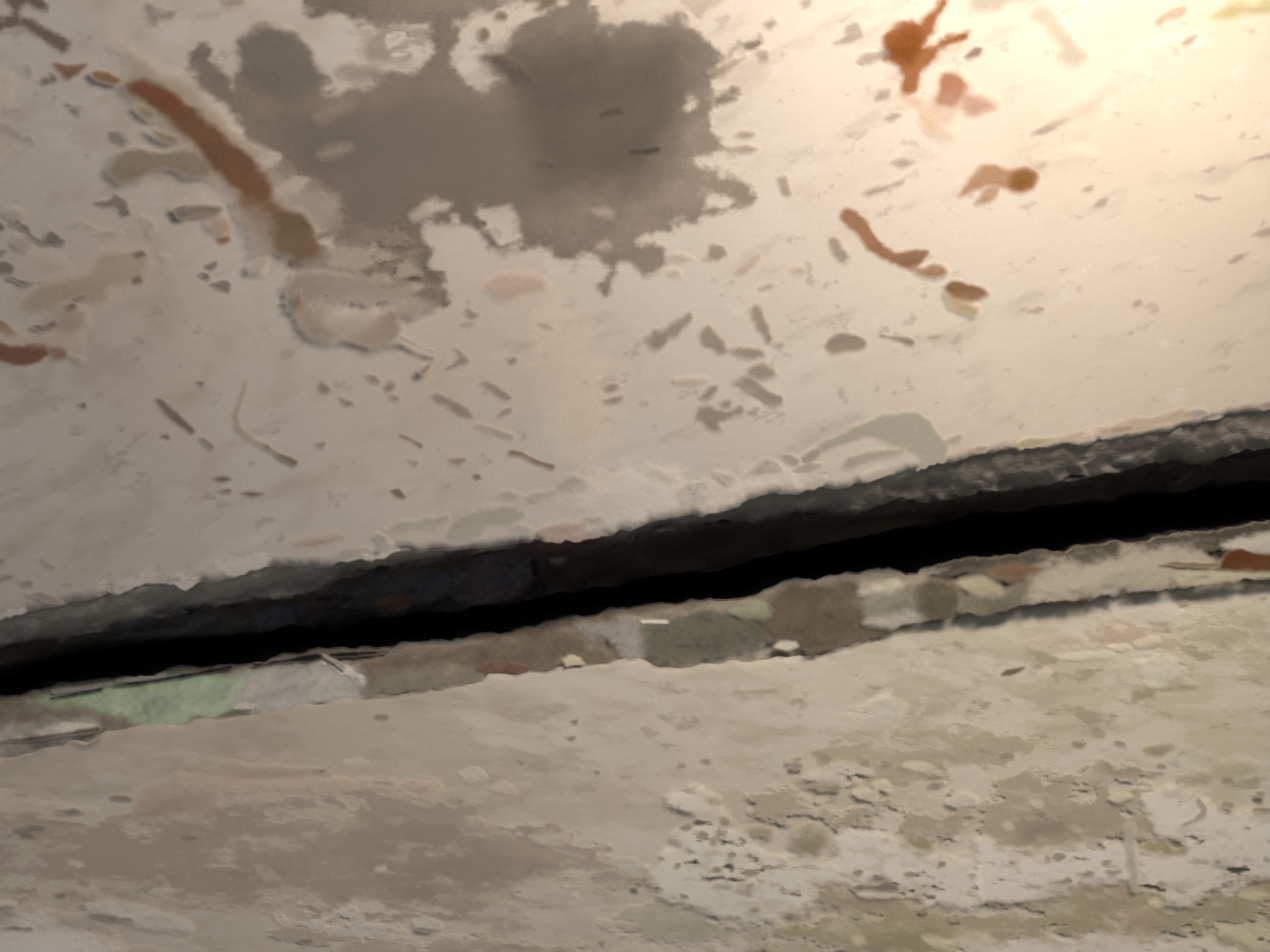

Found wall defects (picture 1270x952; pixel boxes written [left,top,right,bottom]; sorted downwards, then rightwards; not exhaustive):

rust [881,0,999,139]
rust [54,50,320,261]
rust [958,164,1039,205]
rust [840,207,989,317]
peeling [108,574,195,593]
peeling [220,555,268,576]
crack [0,409,1270,759]
peeling [1033,597,1270,683]
spalling [1001,666,1025,676]
water stain [854,781,891,801]
water stain [854,885,898,898]
water stain [86,902,193,931]